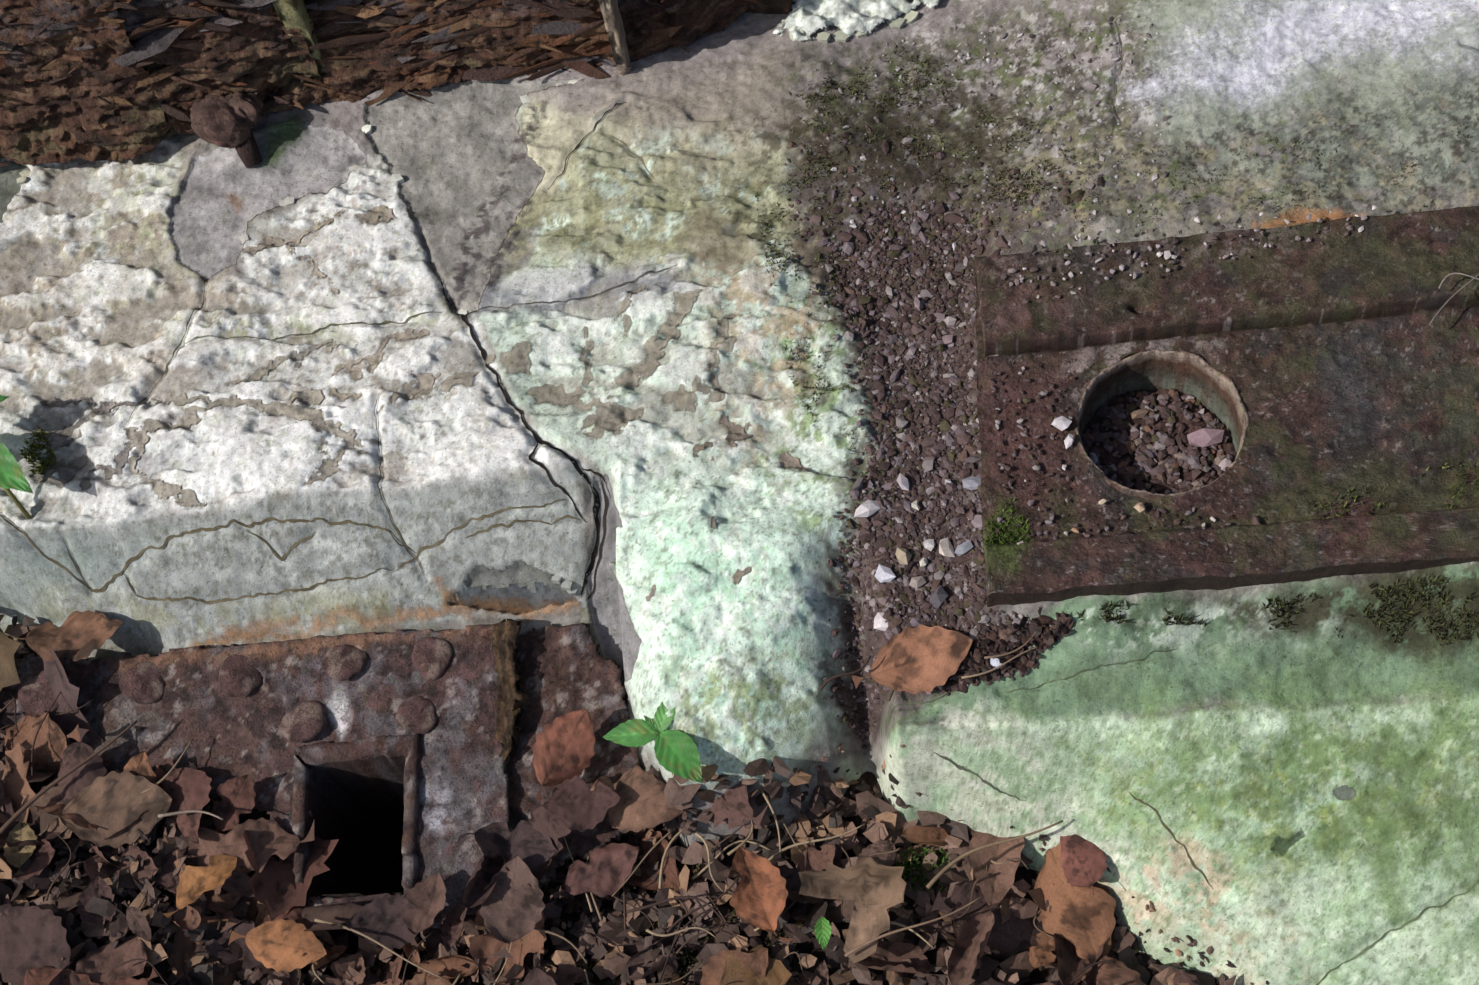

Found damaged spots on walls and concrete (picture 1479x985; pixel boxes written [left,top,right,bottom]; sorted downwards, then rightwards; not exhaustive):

crack [0,245,675,706]